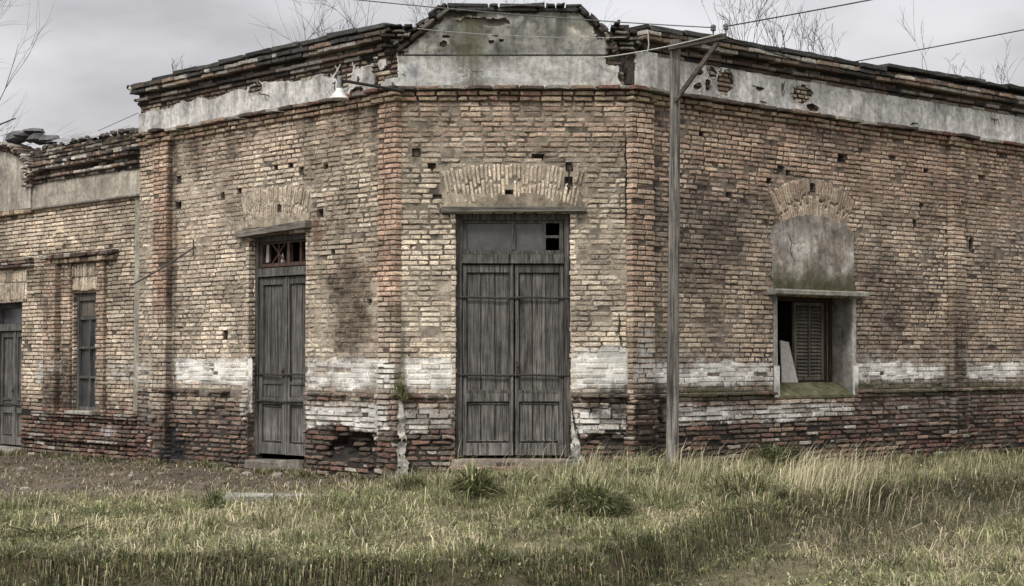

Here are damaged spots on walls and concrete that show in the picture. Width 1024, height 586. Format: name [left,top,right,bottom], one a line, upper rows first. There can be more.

flaking render [692,65,737,99]
flaking render [786,82,820,113]
peeling [306,356,453,479]